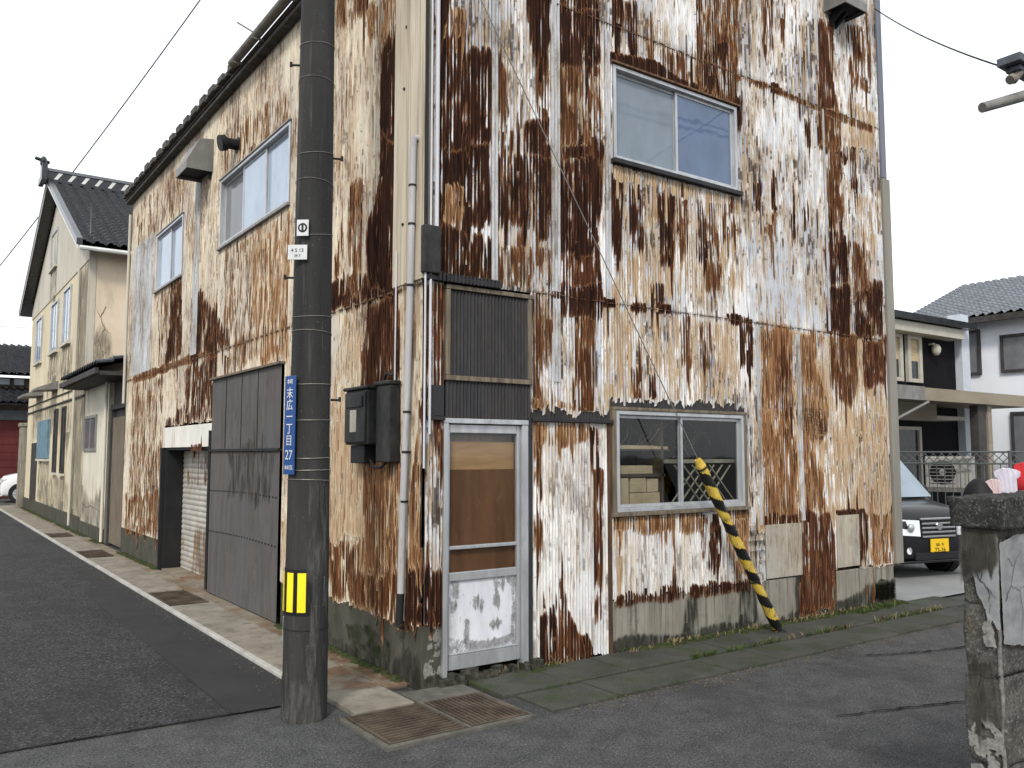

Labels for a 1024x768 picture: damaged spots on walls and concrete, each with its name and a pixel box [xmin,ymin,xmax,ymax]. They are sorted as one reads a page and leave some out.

rust [125,209,290,550]
rust [328,0,894,664]
leakage [280,481,421,724]
peeling [423,575,516,679]
spalling [968,719,1004,768]
crack [972,550,1024,628]